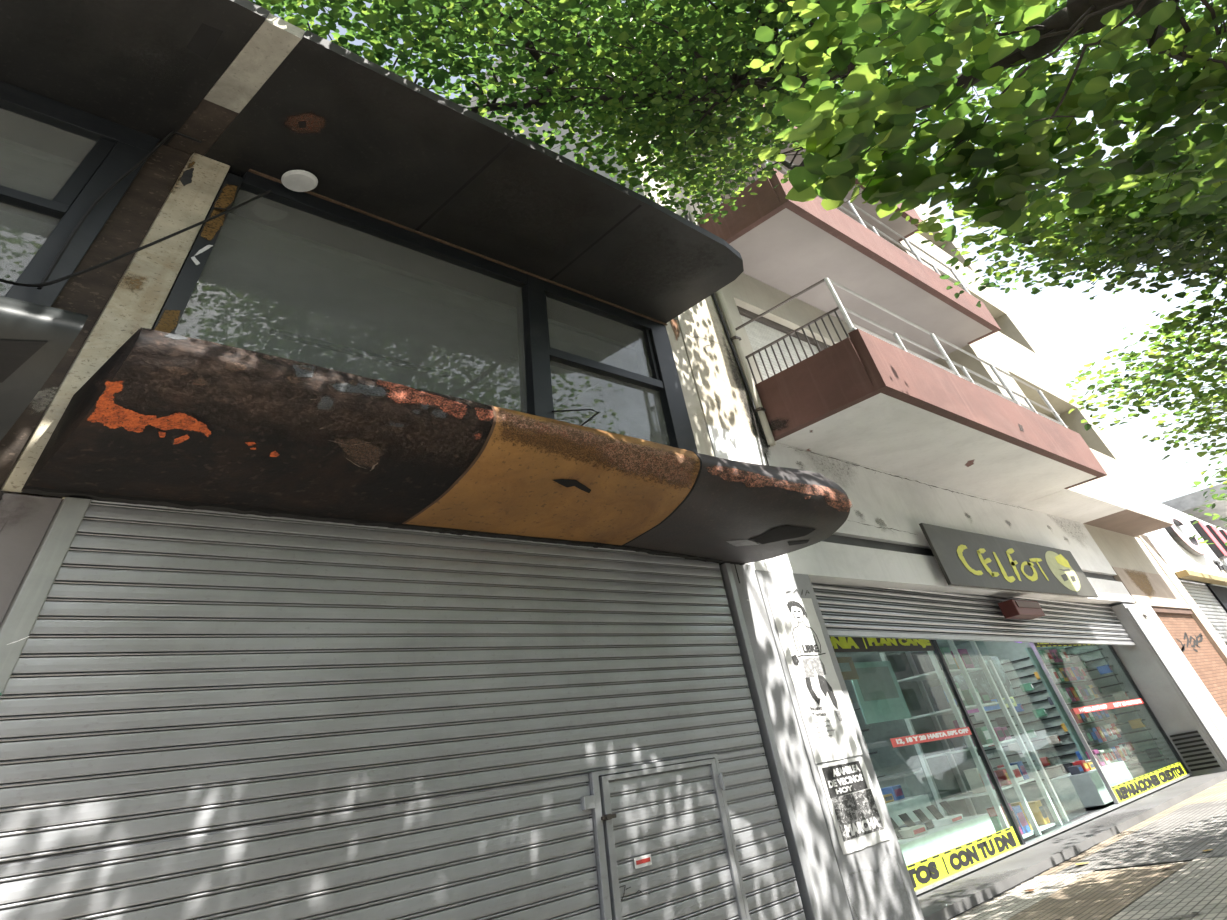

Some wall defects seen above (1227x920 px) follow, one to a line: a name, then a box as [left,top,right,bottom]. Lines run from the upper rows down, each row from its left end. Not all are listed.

rust [375,379,694,486]